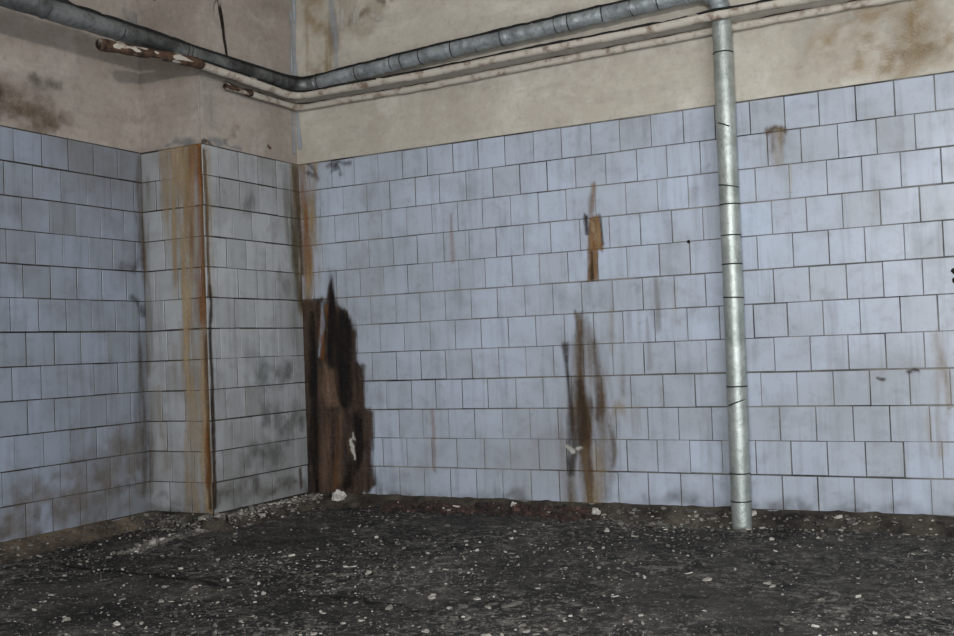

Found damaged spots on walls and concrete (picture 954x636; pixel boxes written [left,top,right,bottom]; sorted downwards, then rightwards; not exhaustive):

crack [217,0,228,55]
rust [164,140,217,515]
rust [291,163,316,308]
spalling [302,281,375,494]
rust [563,312,603,503]